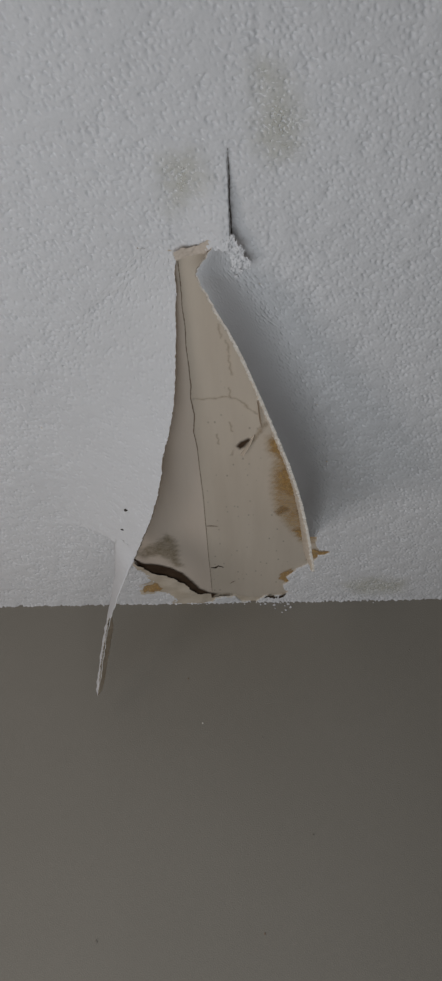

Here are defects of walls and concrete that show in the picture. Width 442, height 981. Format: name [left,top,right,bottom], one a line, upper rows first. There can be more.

peeling [28,135,330,695]